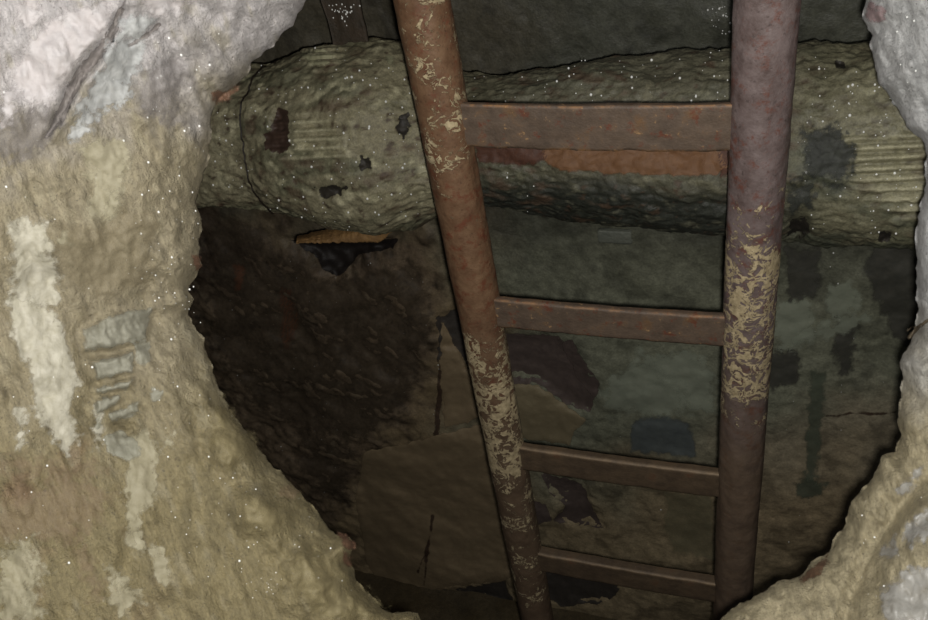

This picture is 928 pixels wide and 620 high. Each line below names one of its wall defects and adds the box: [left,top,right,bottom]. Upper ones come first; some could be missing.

spalling [264,108,291,154]
spalling [291,238,398,276]
leakage [5,216,82,457]
leakage [92,405,104,440]
crack [433,360,442,436]
spalling [506,333,599,412]
leakage [600,347,714,457]
leakage [797,371,828,498]
crack [828,410,895,418]
crack [417,515,434,575]